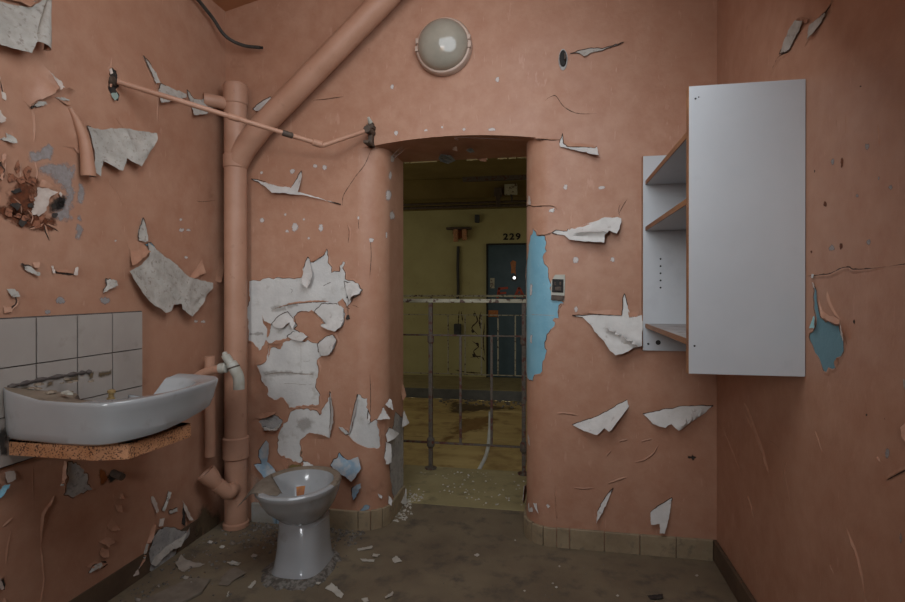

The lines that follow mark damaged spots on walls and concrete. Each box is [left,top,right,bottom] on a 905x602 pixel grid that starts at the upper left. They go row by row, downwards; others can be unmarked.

crack [805,0,833,46]
spalling [0,0,158,241]
peeling [142,55,212,122]
peeling [115,217,224,323]
peeling [526,201,643,382]
crack [807,263,905,279]
peeling [808,282,846,376]
spalling [247,248,409,505]
peeling [572,400,629,435]
peeling [643,405,713,431]
peeling [596,488,613,523]
peeling [650,497,672,534]